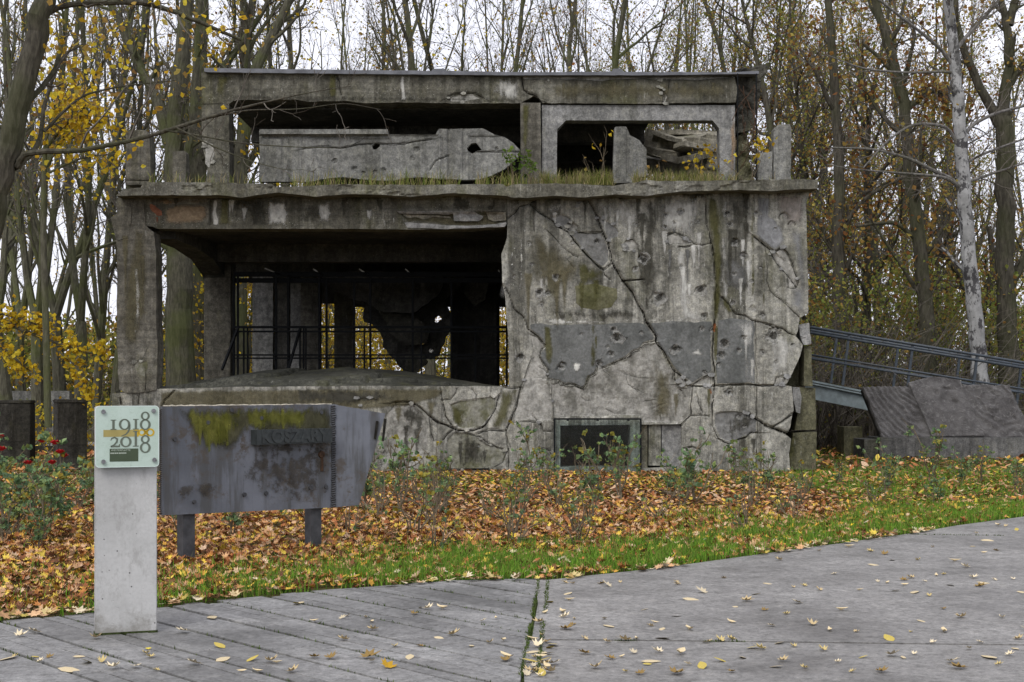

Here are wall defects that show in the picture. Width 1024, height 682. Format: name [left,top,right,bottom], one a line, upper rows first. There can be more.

spalling [397,211,506,230]
leakage [512,254,633,324]
crack [414,194,799,472]
leakage [583,193,716,321]
leakage [161,389,441,451]
spalling [514,336,715,424]